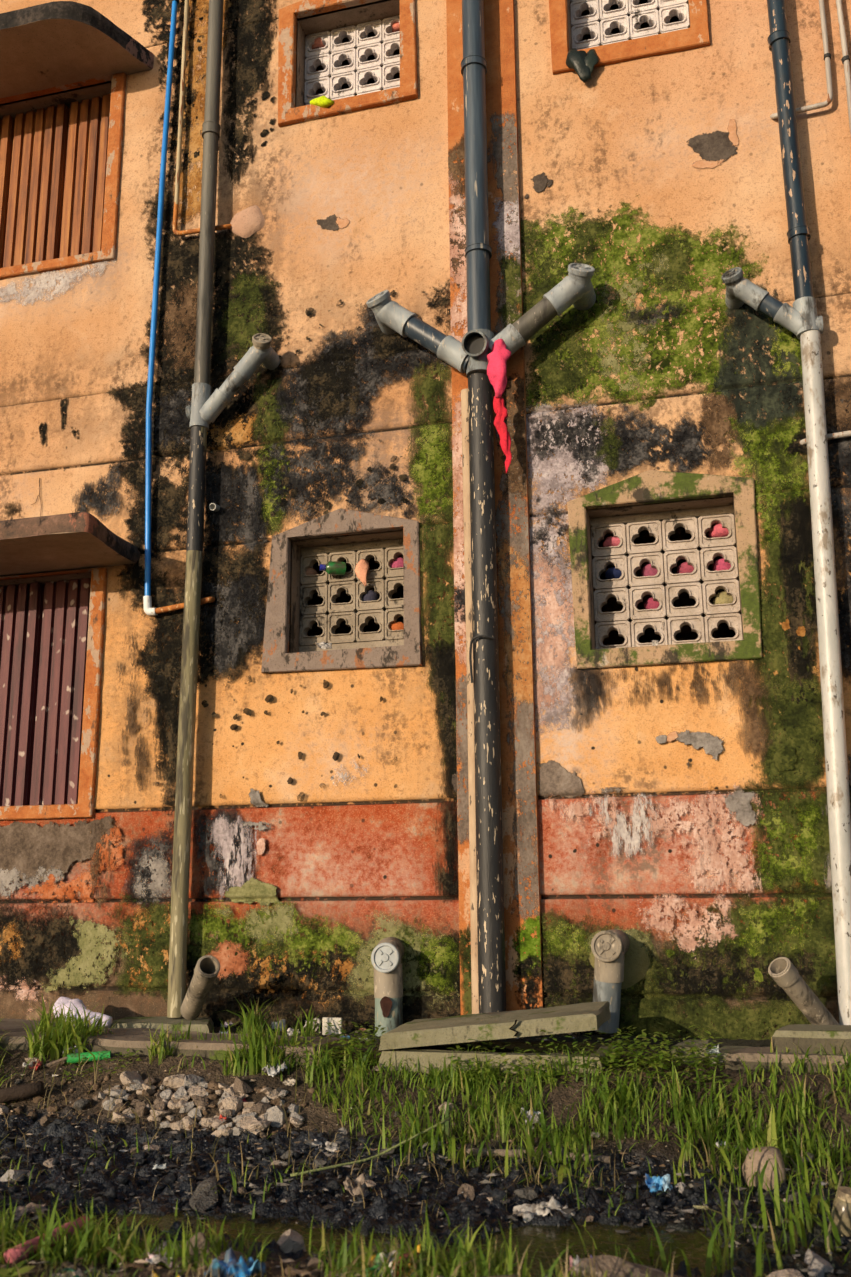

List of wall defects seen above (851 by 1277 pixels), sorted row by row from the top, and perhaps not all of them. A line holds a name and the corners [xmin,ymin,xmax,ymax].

leakage [223,0,277,186]
spalling [316,214,350,231]
spalling [687,119,739,169]
leakage [72,0,206,909]
leakage [191,229,459,903]
peeling [494,373,762,952]
leakage [526,302,807,774]
leakage [778,496,821,706]
leakage [824,375,851,678]
spalling [0,816,128,995]
spalling [242,788,271,855]
leakage [197,943,375,1031]